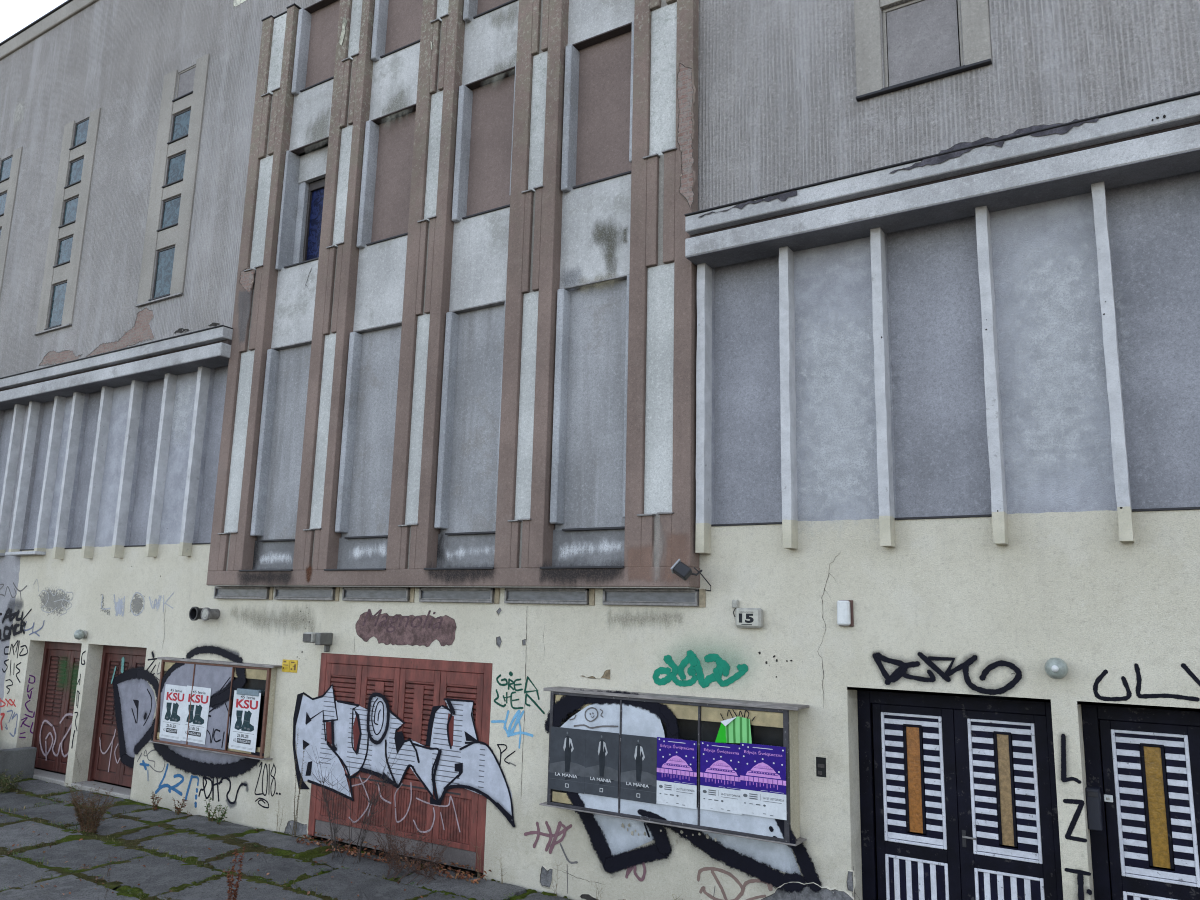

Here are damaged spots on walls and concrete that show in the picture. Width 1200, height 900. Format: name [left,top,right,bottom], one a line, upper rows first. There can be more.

spalling [676,62,797,217]
leakage [564,225,626,287]
spalling [39,307,155,367]
spalling [760,870,856,900]